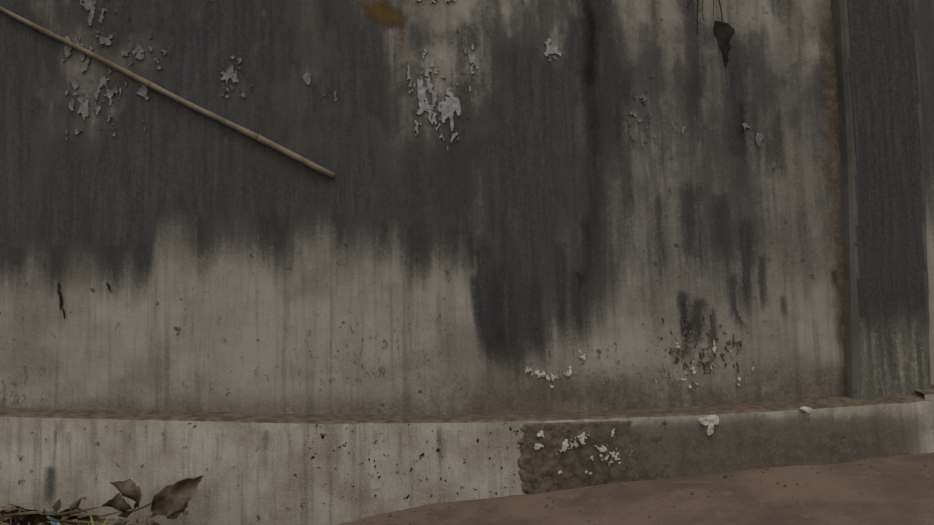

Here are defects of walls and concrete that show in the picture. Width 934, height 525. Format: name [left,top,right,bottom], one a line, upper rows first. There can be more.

peeling [59,0,129,141]
peeling [407,41,471,151]
damp [0,0,828,377]
crack [57,282,65,319]
spalling [507,421,633,494]